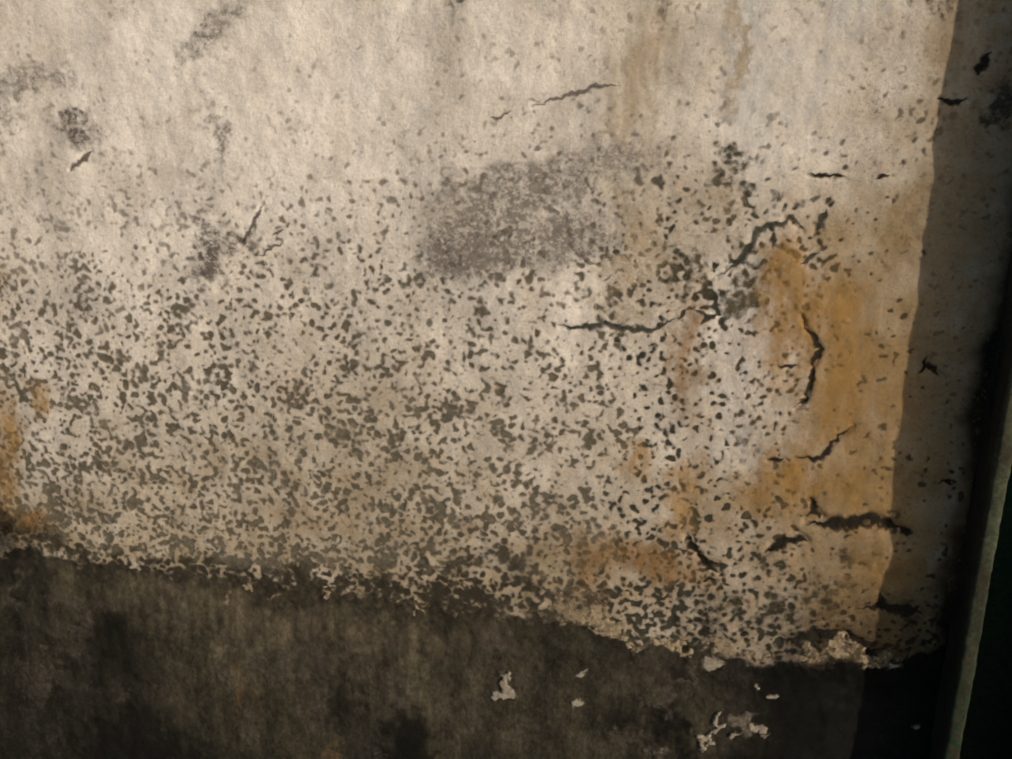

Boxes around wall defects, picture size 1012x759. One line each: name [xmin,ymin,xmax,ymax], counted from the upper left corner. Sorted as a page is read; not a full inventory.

crack [493,83,619,120]
peeling [912,113,942,154]
peeling [632,151,685,193]
crack [558,308,721,333]
crack [777,317,824,407]
peeling [0,177,939,669]
crack [769,426,853,463]
crack [763,499,913,554]
leakage [0,519,578,626]
leakage [699,548,949,759]